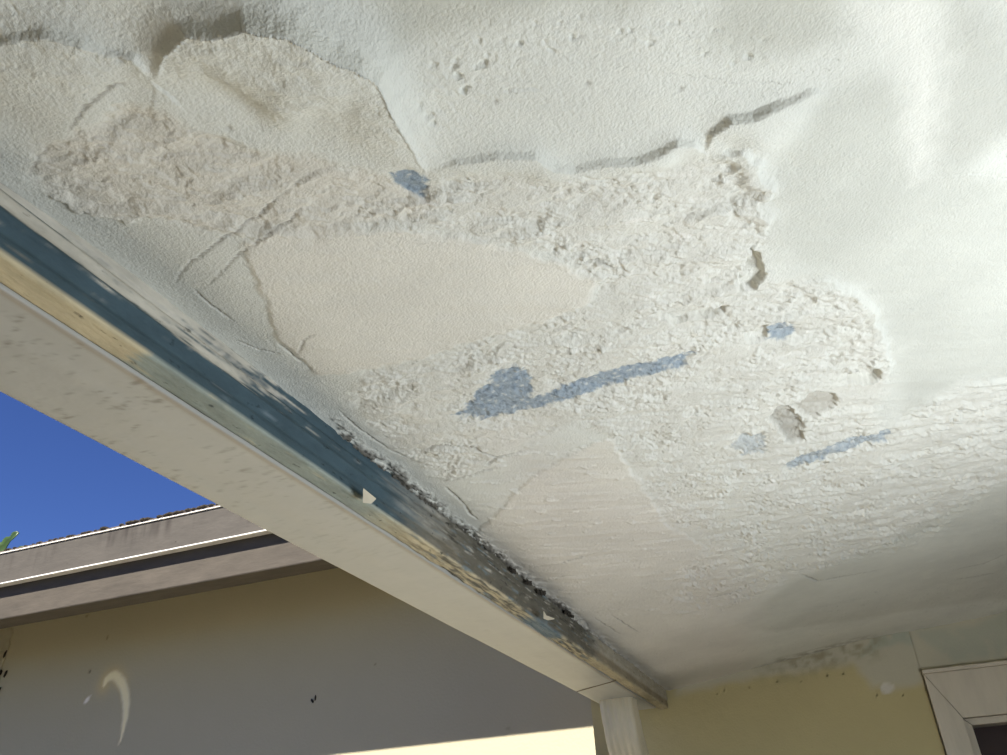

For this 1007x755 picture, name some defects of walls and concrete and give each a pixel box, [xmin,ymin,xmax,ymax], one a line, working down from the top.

spalling [1,90,1007,620]
damp [91,507,256,559]
damp [324,414,631,661]